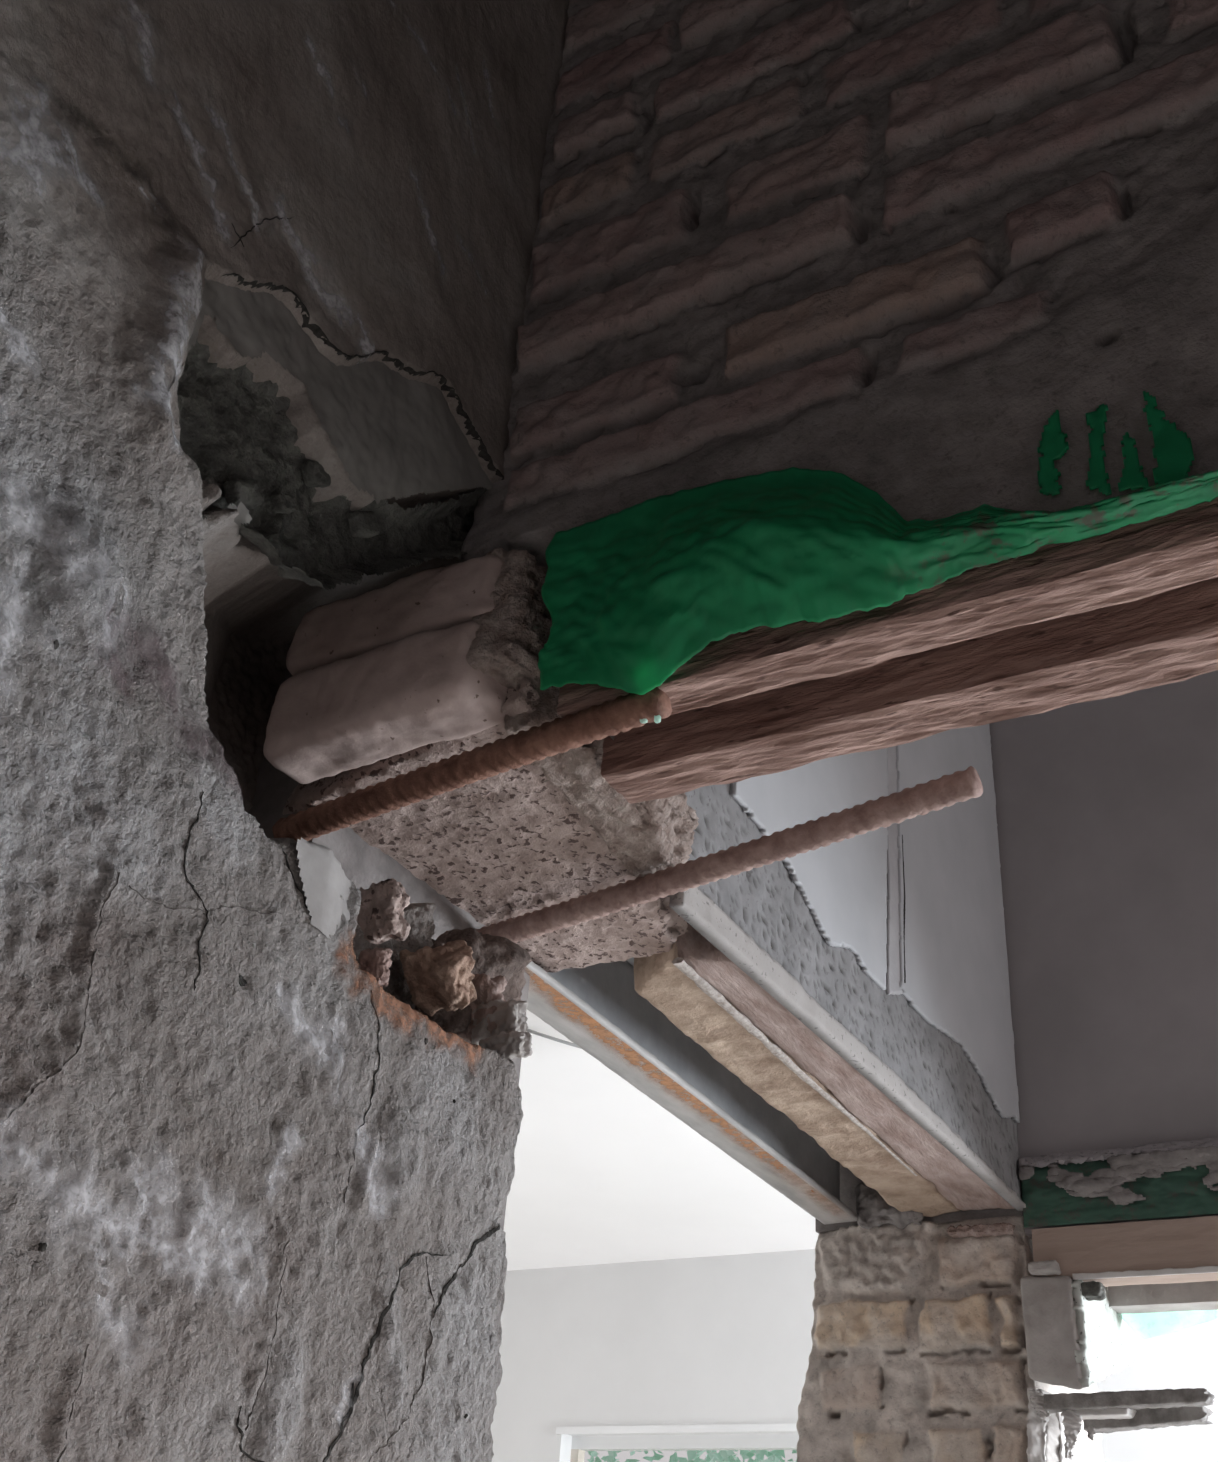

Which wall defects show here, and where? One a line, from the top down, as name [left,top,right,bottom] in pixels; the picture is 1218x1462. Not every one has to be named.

flaking render [177,273,504,590]
spalling [272,687,672,841]
corrosion [337,943,481,1064]
peeling [475,724,1020,1123]
crack [236,1238,290,1462]
crack [323,1223,500,1462]